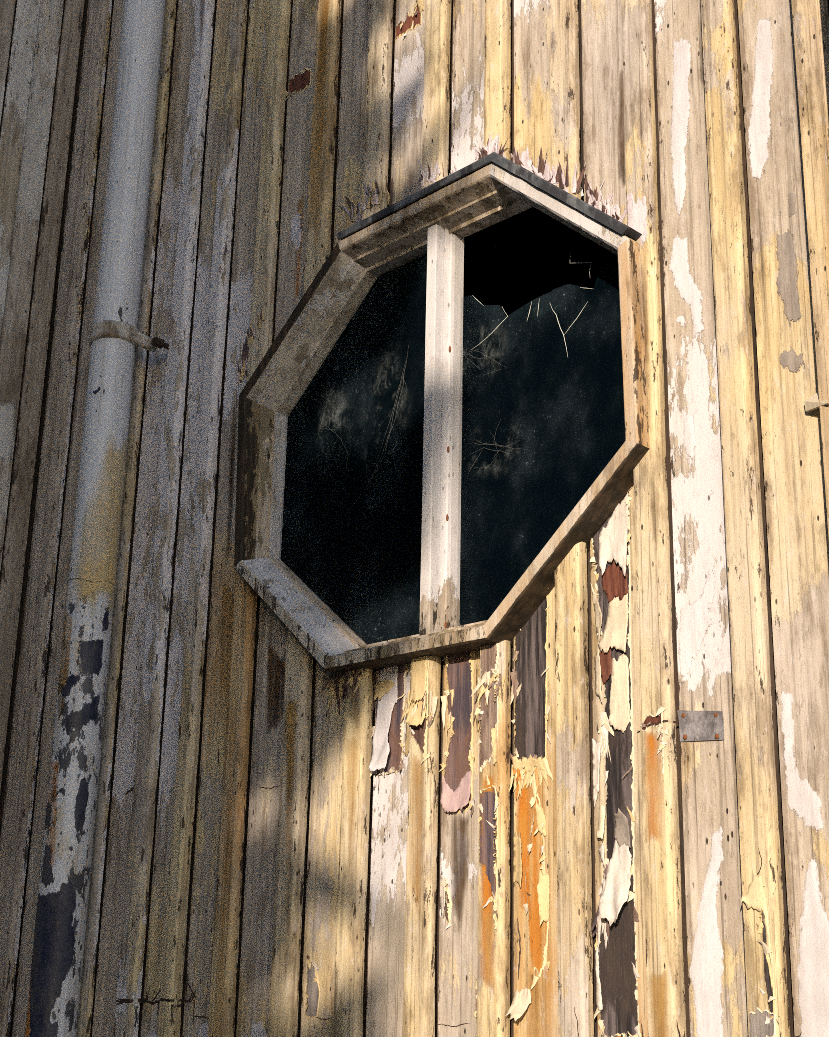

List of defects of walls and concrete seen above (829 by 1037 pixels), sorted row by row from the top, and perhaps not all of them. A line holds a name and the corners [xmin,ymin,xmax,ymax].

peeling [395,0,424,42]
peeling [284,67,313,101]
peeling [339,176,393,224]
peeling [417,159,458,189]
peeling [474,131,648,247]
peeling [590,487,669,1037]
peeling [318,588,553,1021]
crack [116,978,209,1023]
peeling [304,955,320,1020]